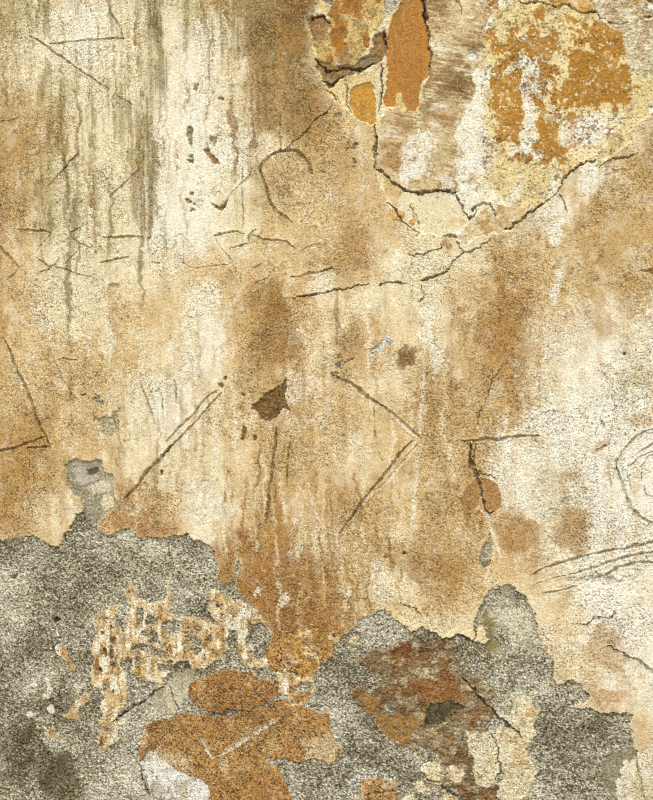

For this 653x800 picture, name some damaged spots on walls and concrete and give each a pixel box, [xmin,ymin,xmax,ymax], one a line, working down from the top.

damp [42,0,51,37]
crack [306,15,331,24]
damp [36,59,53,109]
damp [55,83,83,171]
damp [124,0,168,236]
crack [285,31,640,233]
spalling [307,0,653,245]
crack [404,233,487,258]
crack [293,271,449,304]
spalling [251,379,291,422]
spalling [0,459,638,800]
crack [606,645,653,674]